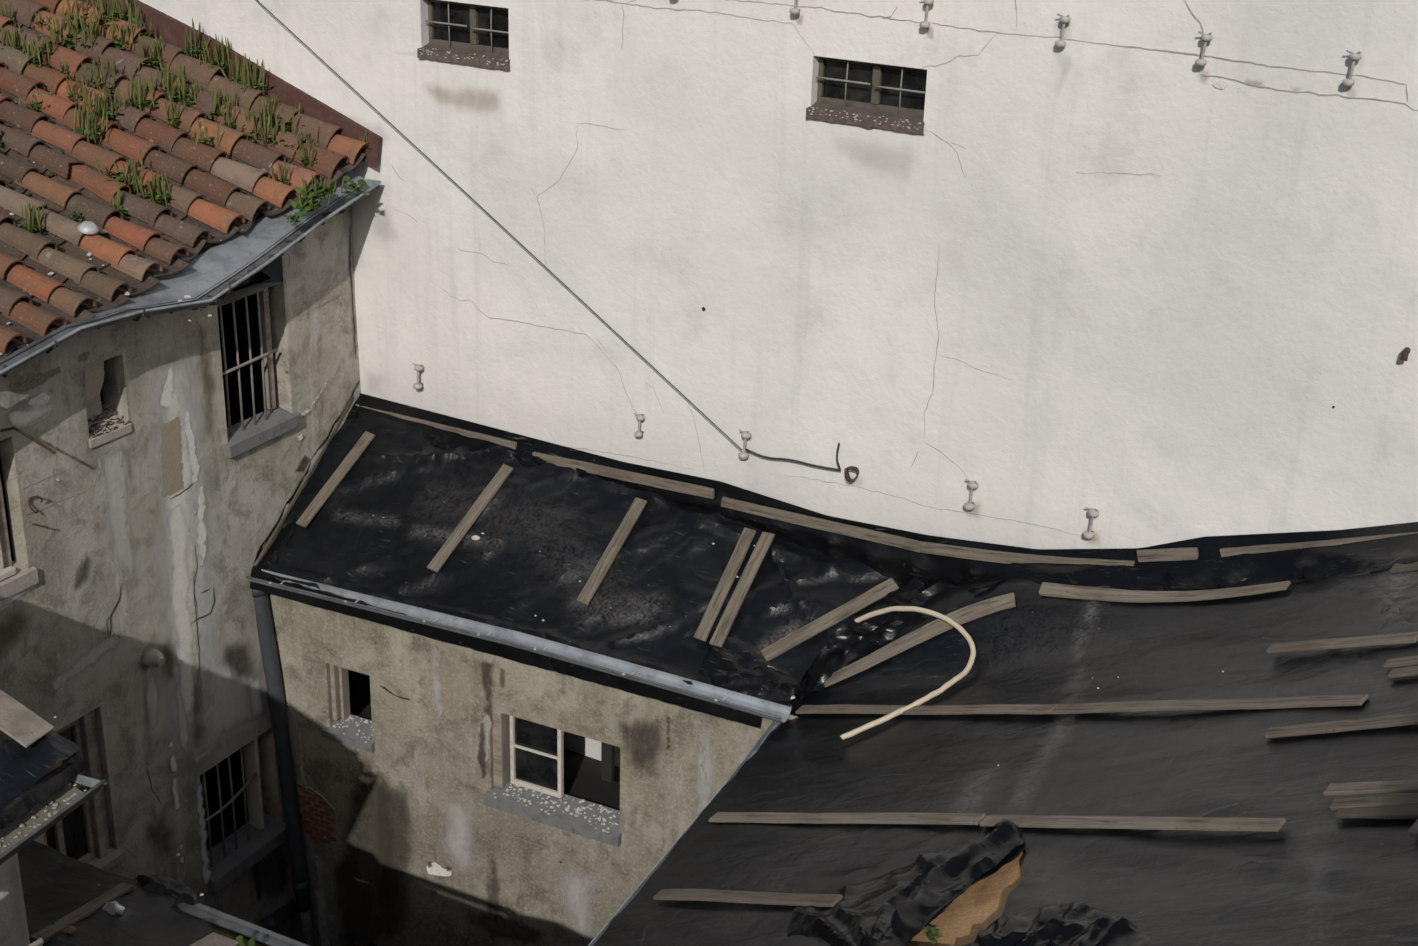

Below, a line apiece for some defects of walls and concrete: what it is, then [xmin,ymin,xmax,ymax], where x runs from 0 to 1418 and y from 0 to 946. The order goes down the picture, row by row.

crack [597,0,1416,111]
crack [531,123,614,264]
crack [794,258,1093,539]
peeling [160,367,207,744]
damp [315,767,409,946]
damp [446,804,471,867]
damp [468,867,540,942]